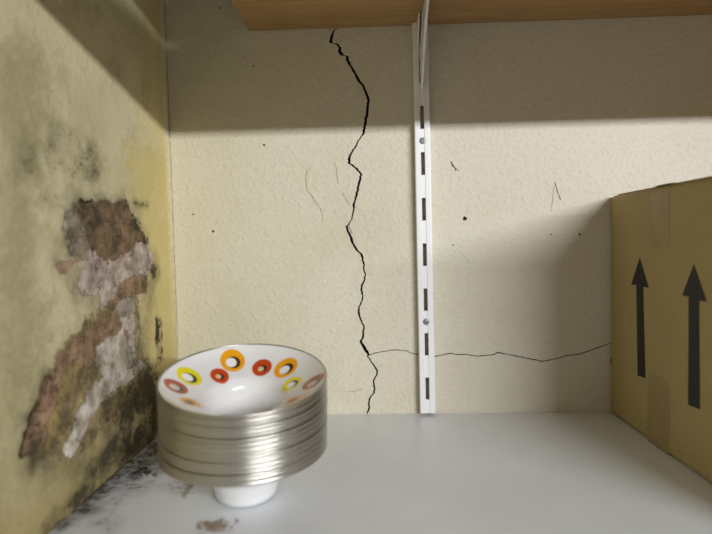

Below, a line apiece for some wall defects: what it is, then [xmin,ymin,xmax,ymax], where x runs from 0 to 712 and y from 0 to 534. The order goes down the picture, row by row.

peeling [21,199,157,461]
damp [45,317,163,533]
crack [329,28,415,412]
crack [434,343,610,362]